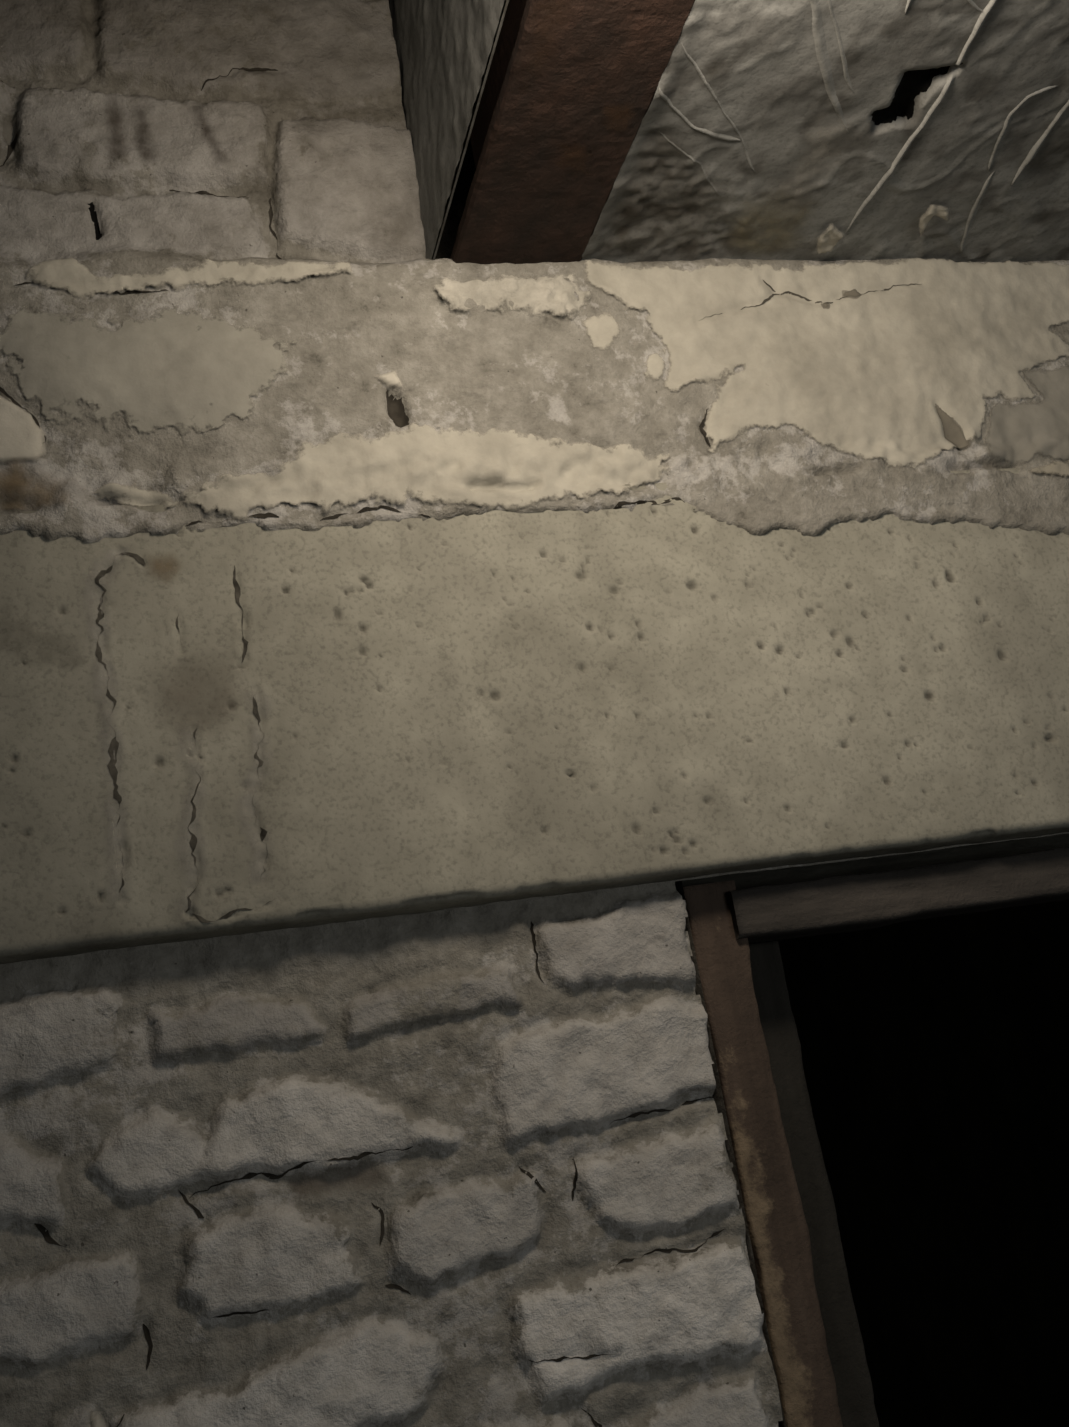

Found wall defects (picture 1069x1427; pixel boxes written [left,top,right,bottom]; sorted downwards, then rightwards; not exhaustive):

hole [871,63,963,125]
peeling [17,258,352,298]
peeling [583,258,1069,468]
peeling [0,387,46,462]
peeling [95,371,695,526]
crack [233,565,248,662]
crack [95,552,145,890]
crack [186,697,279,923]
crack [179,1146,413,1219]